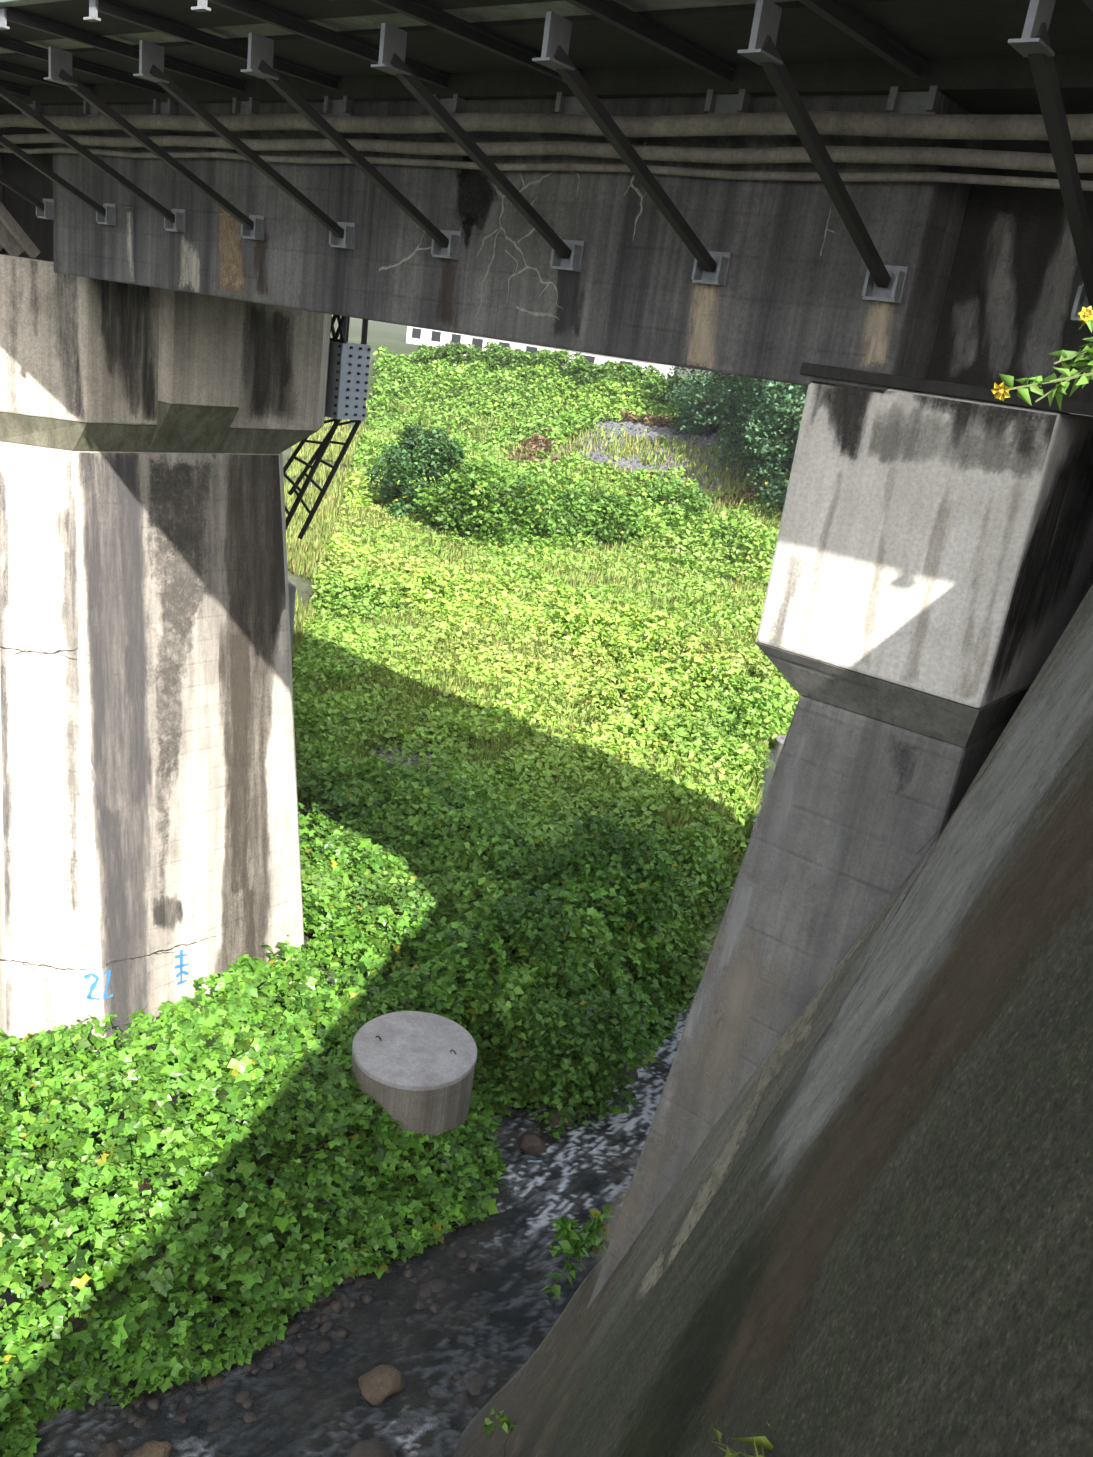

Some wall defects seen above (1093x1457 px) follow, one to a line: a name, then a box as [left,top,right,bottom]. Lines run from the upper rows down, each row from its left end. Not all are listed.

water stain [99,215,155,418]
crack [379,229,431,272]
crack [475,171,580,319]
crack [624,142,647,238]
water stain [865,301,891,364]
water stain [816,381,1057,476]
water stain [990,431,1093,693]
crack [0,646,86,660]
water stain [59,452,150,1050]
water stain [218,454,286,974]
crack [0,936,216,971]
water stain [465,1244,635,1457]